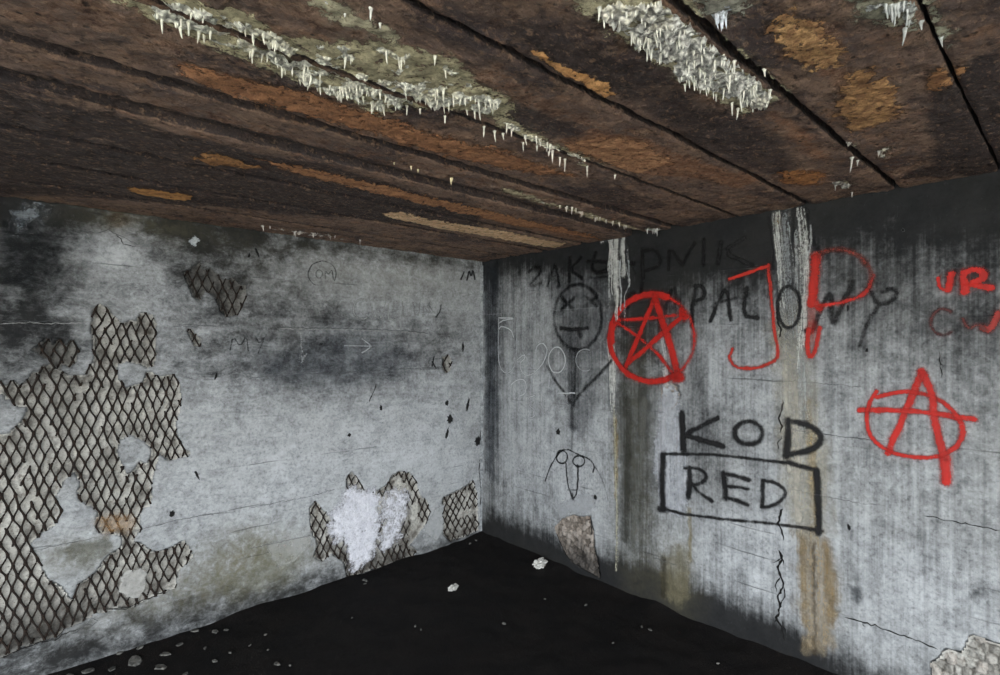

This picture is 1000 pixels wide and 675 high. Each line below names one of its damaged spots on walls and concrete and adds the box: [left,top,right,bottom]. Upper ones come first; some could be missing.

water stain [110,0,603,176]
water stain [573,0,790,120]
water stain [5,202,65,282]
spalling [184,263,247,317]
water stain [772,208,815,521]
spalling [0,304,193,659]
water stain [327,486,410,573]
spalling [310,471,479,577]
spalling [555,515,600,578]
crack [773,489,876,640]
spalling [930,635,1000,675]